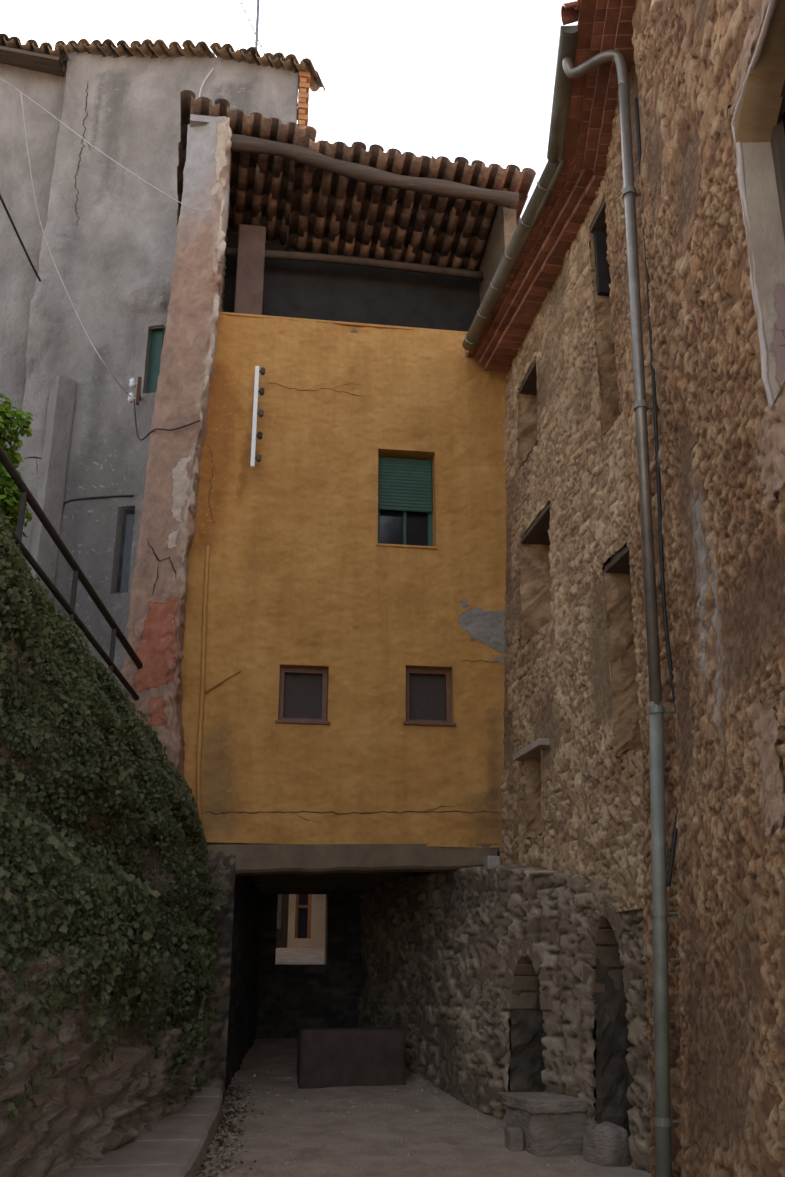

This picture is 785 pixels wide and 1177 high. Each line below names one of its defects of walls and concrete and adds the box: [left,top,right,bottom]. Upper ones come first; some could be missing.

crack [75,84,91,226]
spalling [133,597,180,727]
crack [147,538,176,595]
flaking render [458,599,506,664]